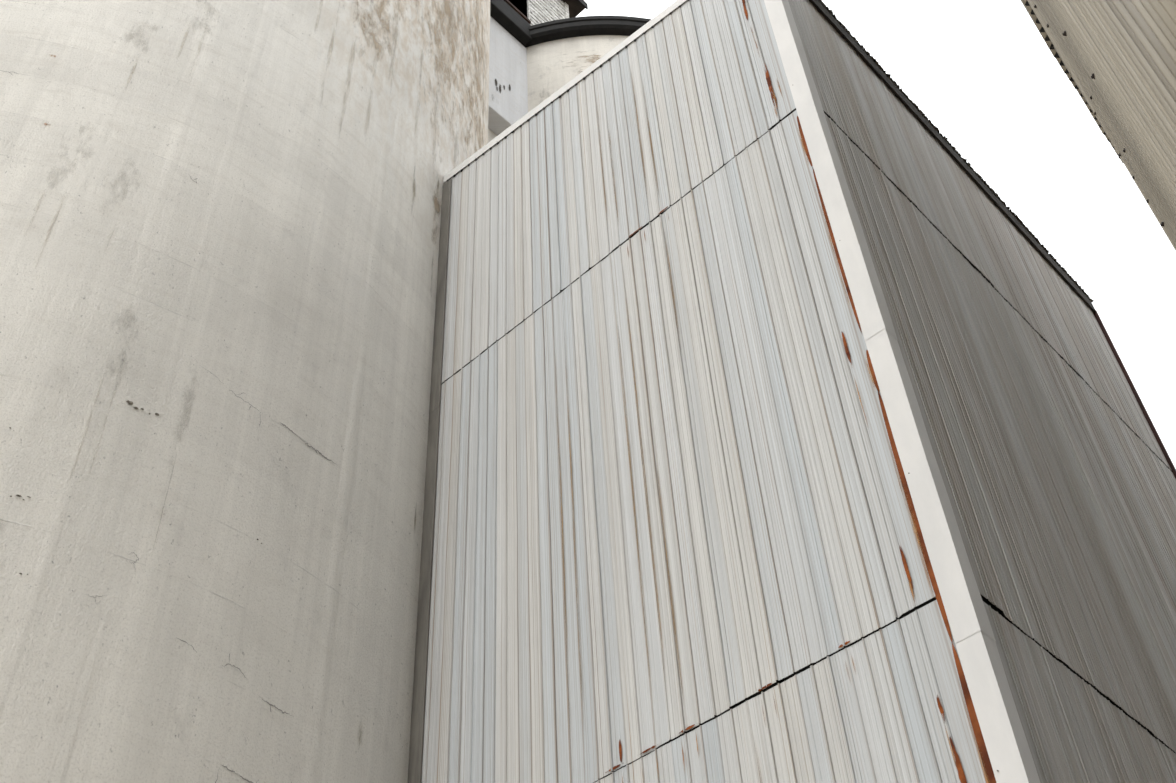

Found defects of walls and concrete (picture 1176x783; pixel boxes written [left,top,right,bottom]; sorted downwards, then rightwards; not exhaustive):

water stain [428,0,484,150]
corrosion [764,63,782,114]
corrosion [797,116,862,333]
corrosion [866,350,996,783]